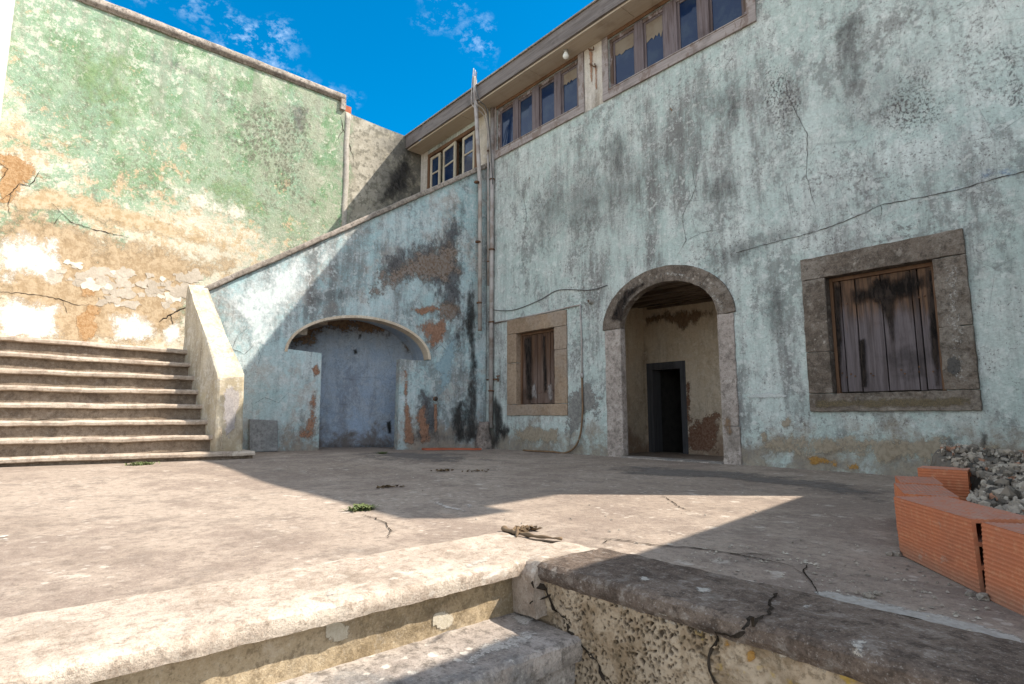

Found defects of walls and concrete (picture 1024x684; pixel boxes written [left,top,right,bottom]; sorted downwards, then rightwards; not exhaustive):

crack [736,61,1024,253]
crack [53,204,128,238]
crack [9,292,79,314]
peeling [0,212,236,346]
peeling [412,301,461,348]
leakage [452,293,477,441]
peeling [686,381,720,454]
crack [529,581,605,681]
crack [707,593,778,684]